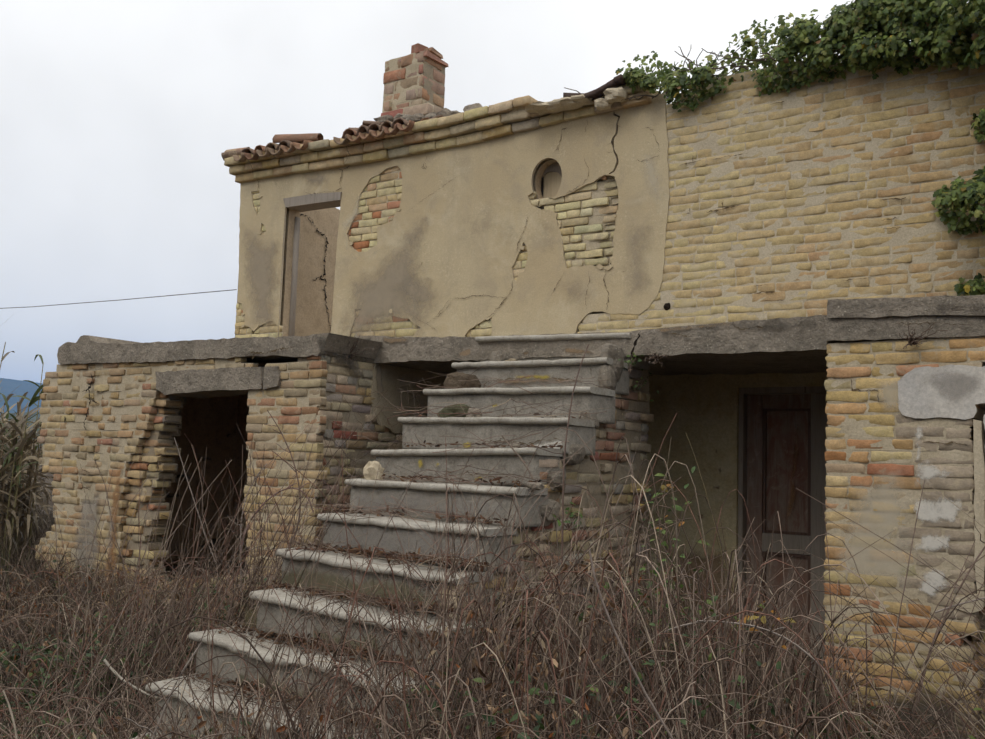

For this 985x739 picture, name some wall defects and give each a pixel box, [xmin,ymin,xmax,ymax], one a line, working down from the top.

crack [608,112,659,172]
crack [300,146,350,331]
flaking render [348,166,402,252]
flaking render [529,176,618,271]
crack [417,281,513,331]